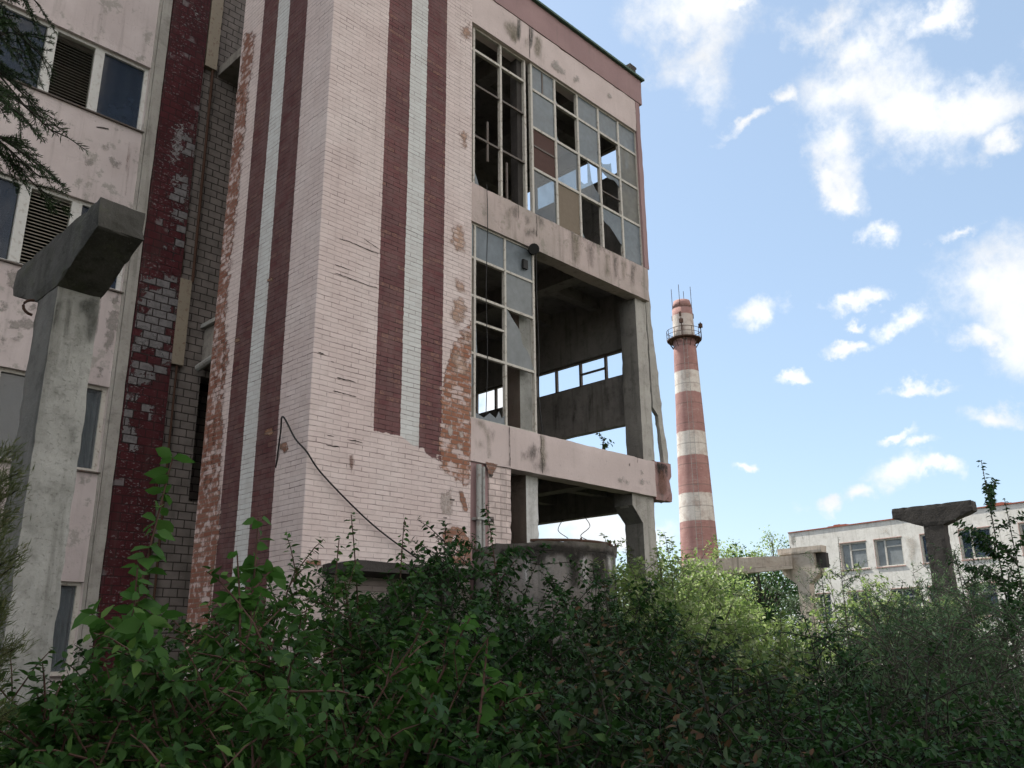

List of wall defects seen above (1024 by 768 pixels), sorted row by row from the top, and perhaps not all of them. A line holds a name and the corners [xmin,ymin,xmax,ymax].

peeling [119,274,179,453]
peeling [161,123,195,256]
peeling [183,32,256,657]
crack [336,239,379,288]
flaking render [436,281,471,566]
peeling [451,225,465,251]